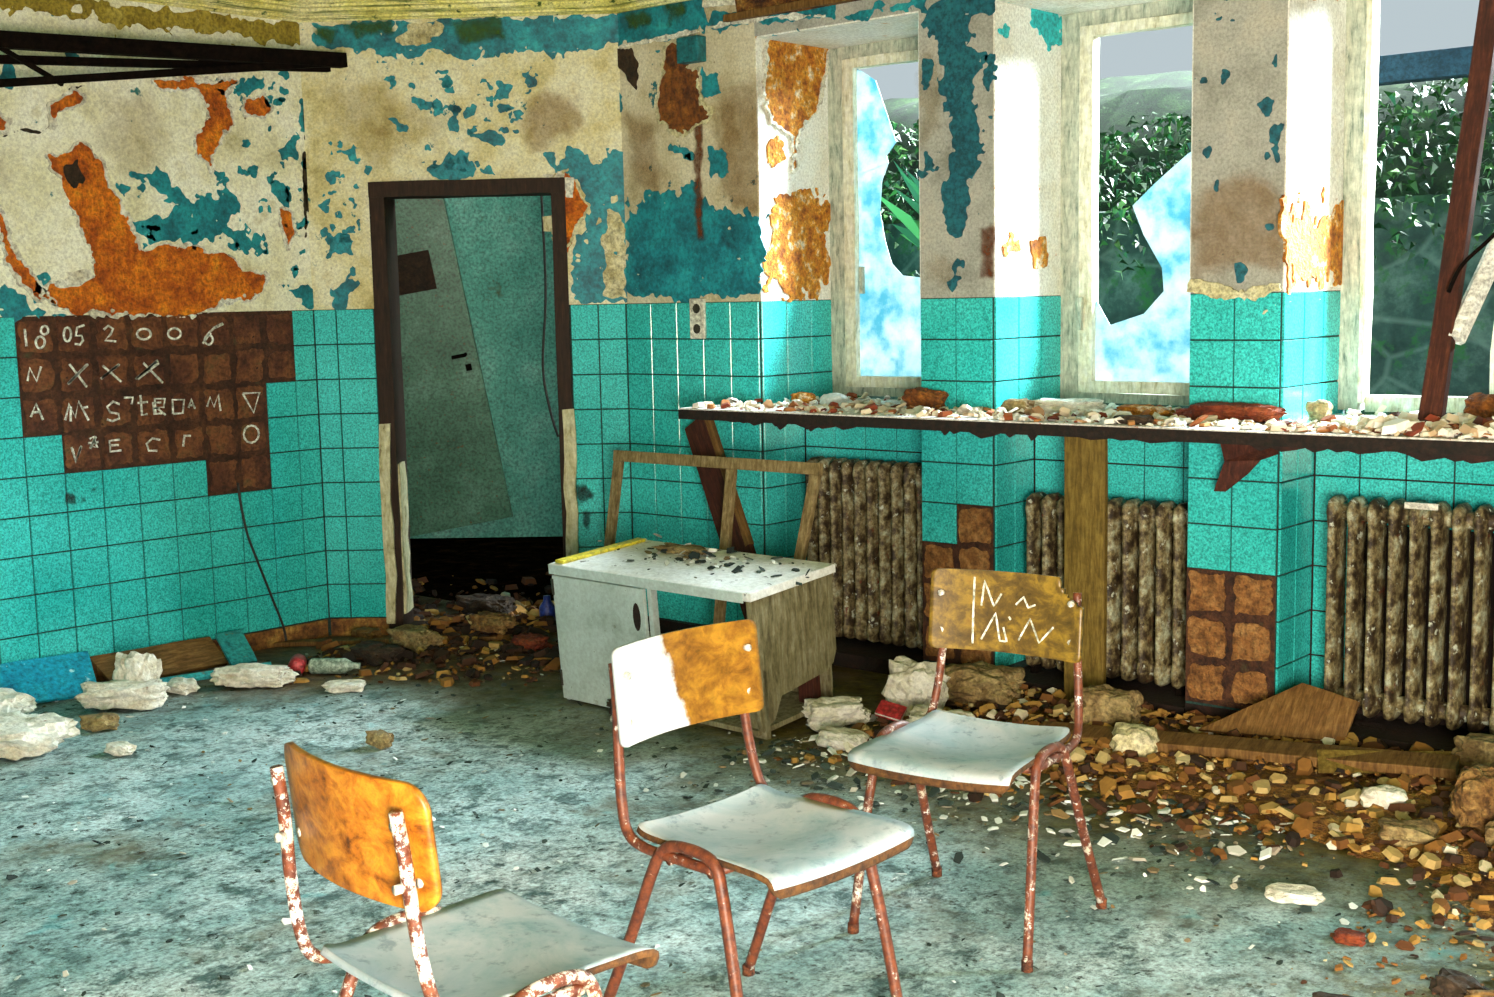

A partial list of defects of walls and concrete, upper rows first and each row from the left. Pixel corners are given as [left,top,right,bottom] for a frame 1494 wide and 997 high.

peeling [0,71,372,496]
peeling [0,0,1010,304]
spalling [1002,231,1049,269]
peeling [1030,8,1062,52]